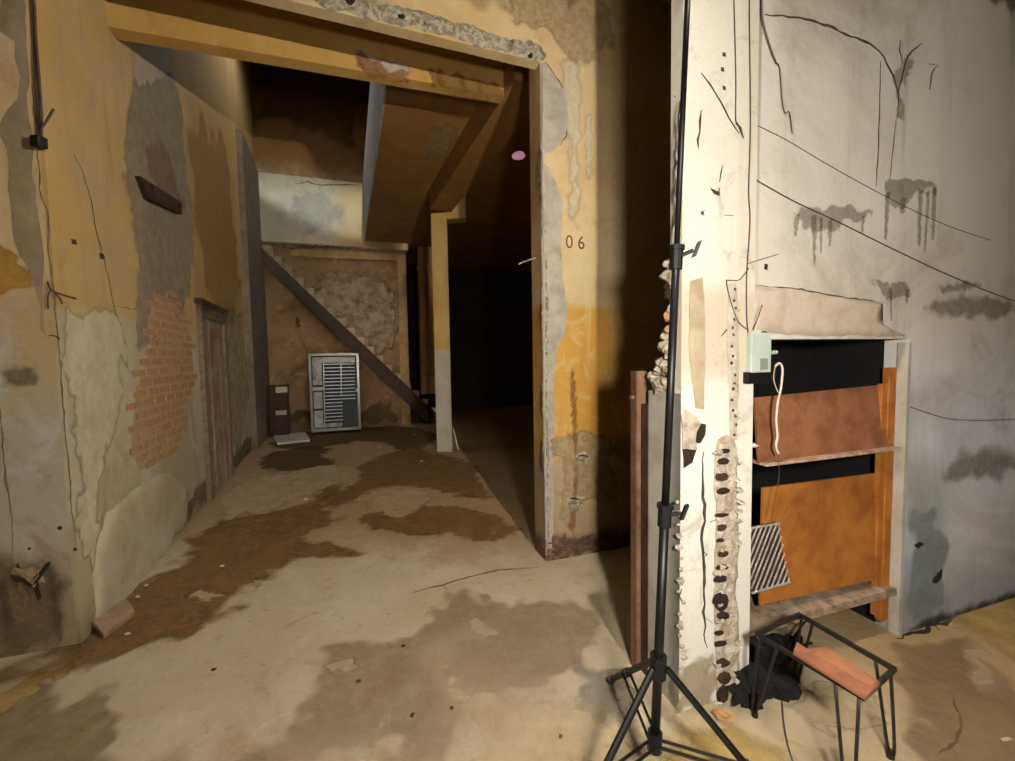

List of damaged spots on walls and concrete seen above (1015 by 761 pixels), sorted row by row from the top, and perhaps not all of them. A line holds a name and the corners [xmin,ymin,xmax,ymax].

crack [765,14,938,185]
peeling [62,74,197,569]
peeling [314,0,616,555]
spalling [646,259,677,394]
peeling [681,277,706,468]
crack [759,285,884,303]
crack [0,410,13,566]
spalling [713,283,745,706]
damp [0,402,521,761]
damp [259,593,644,761]
damp [675,658,717,714]
damp [659,727,785,761]